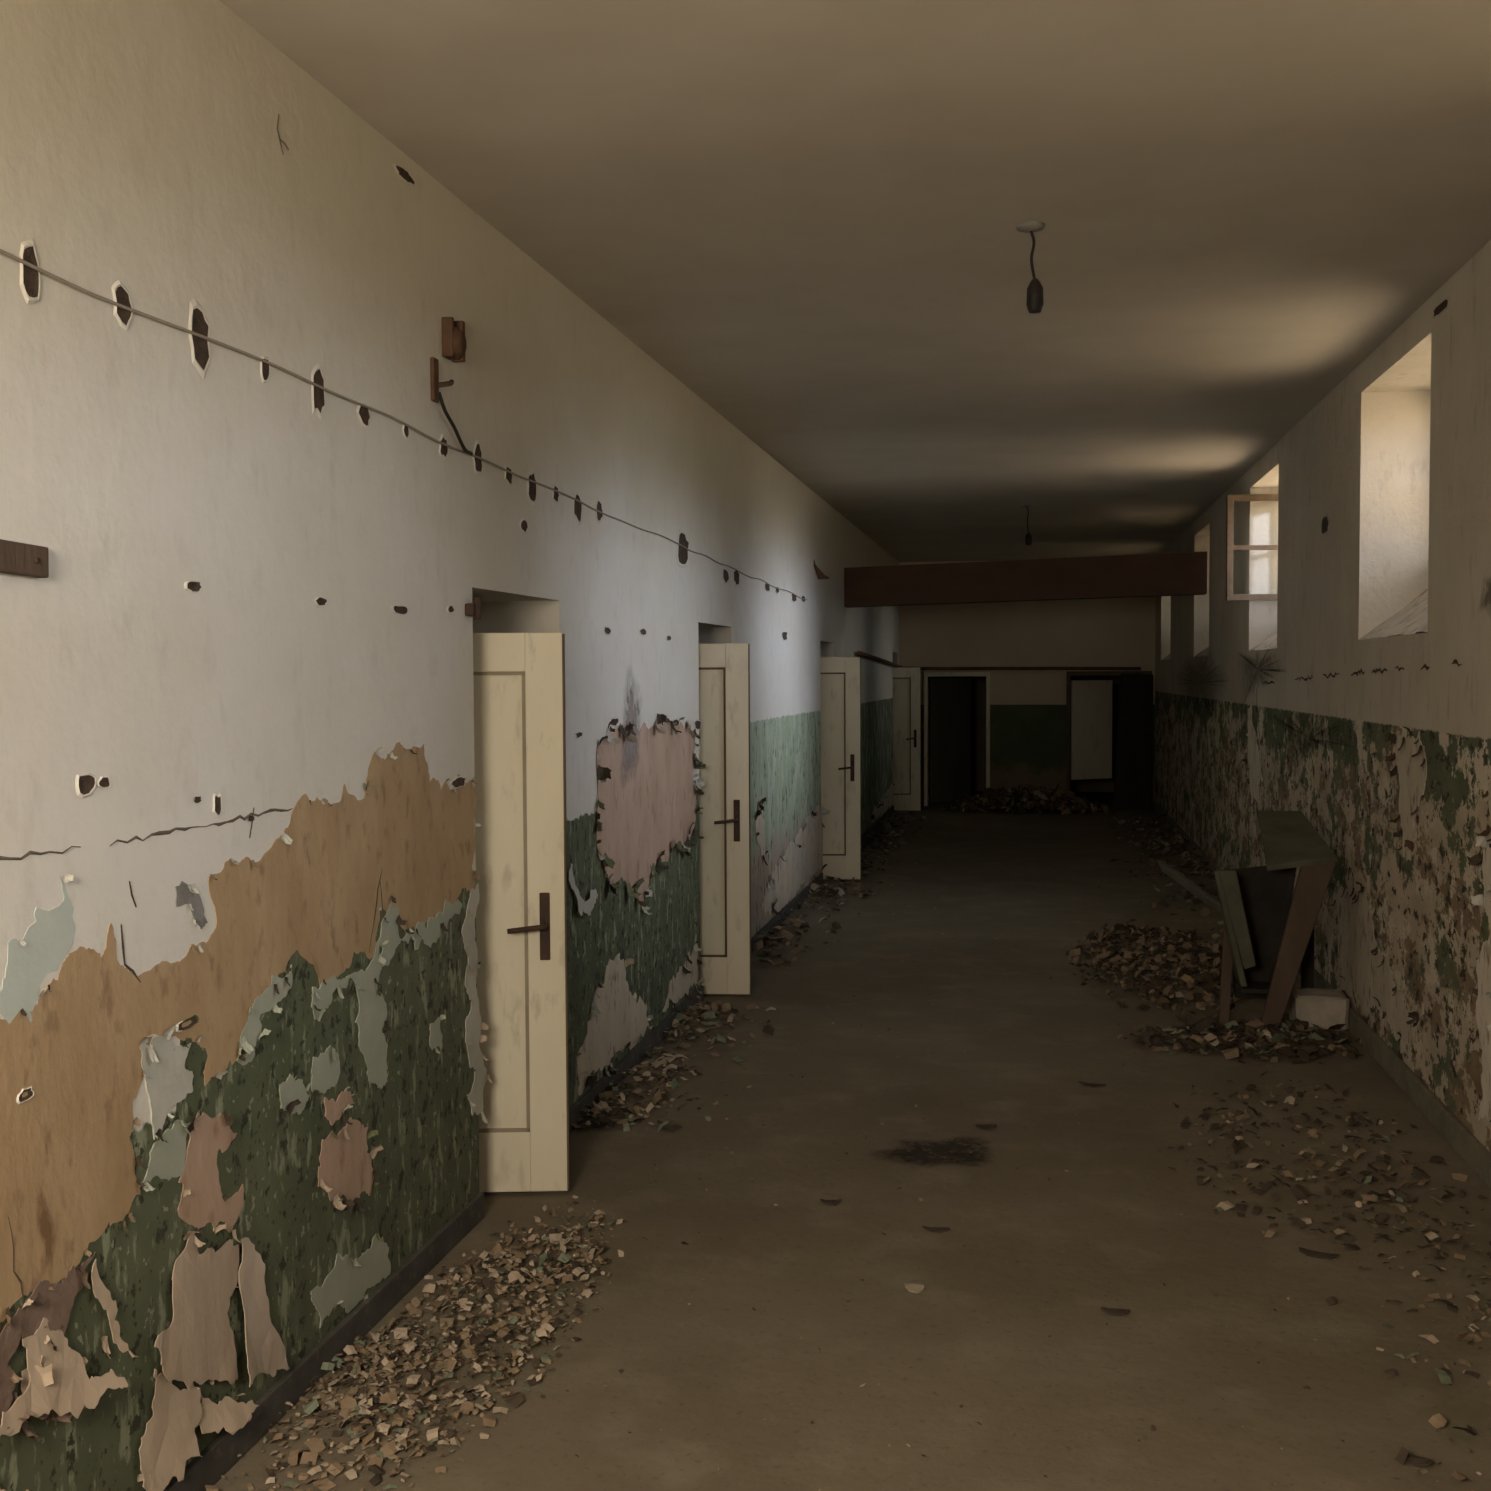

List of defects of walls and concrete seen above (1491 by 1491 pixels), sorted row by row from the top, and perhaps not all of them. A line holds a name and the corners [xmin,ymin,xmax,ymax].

crack [0,808,293,860]
peeling [568,713,706,917]
peeling [755,797,830,917]
peeling [1242,704,1263,805]
peeling [1385,726,1427,862]
crack [121,881,141,983]
peeling [576,934,705,1096]
peeling [1467,778,1491,1122]
peeling [0,742,492,1491]